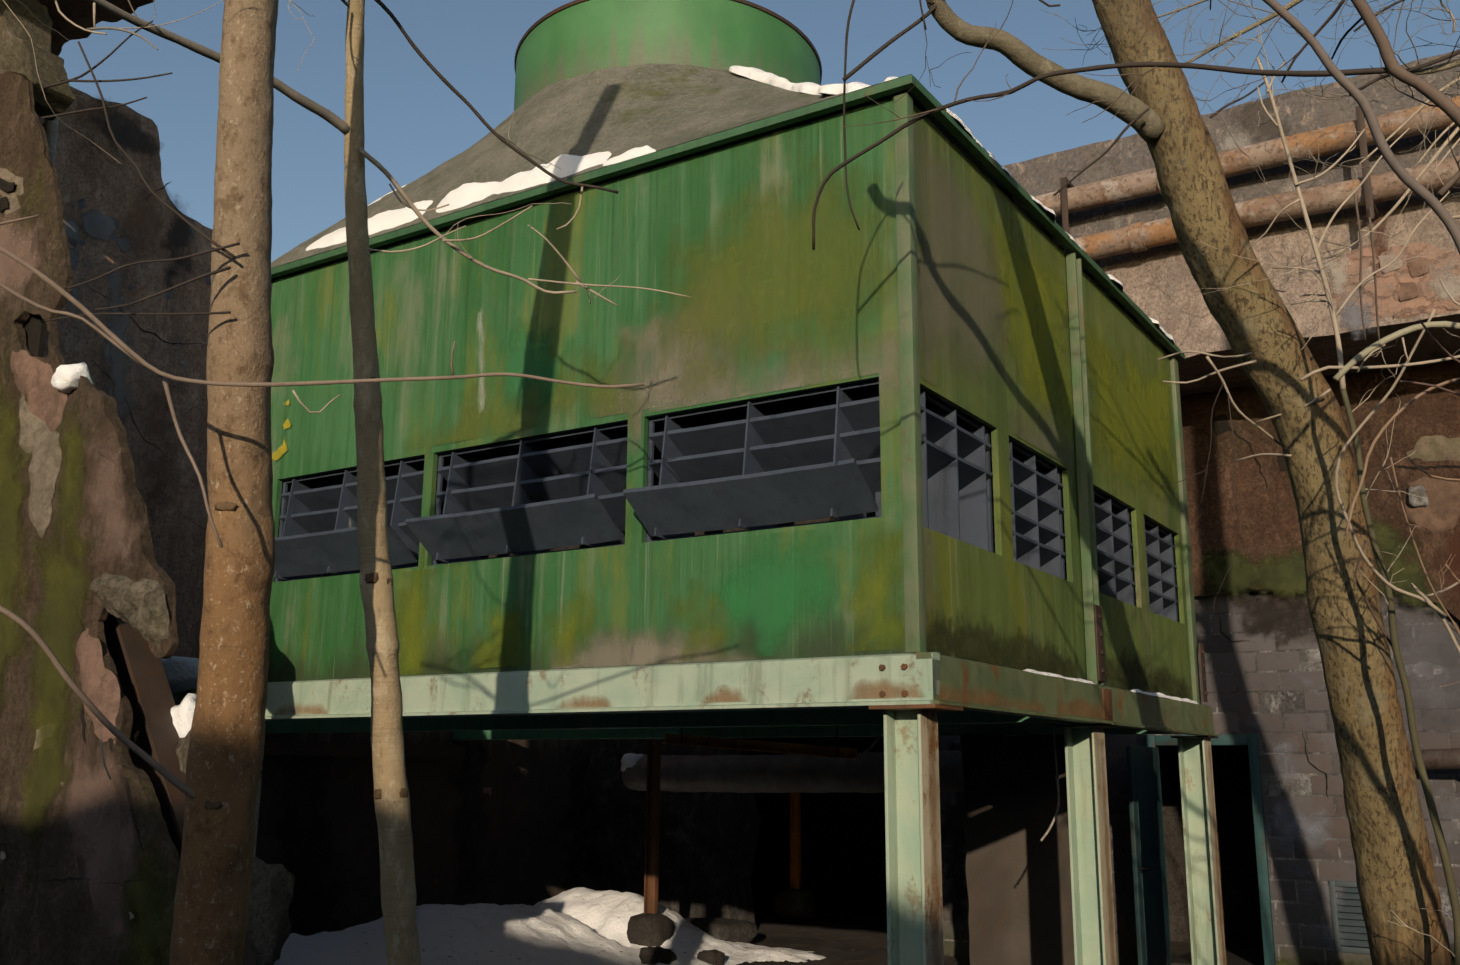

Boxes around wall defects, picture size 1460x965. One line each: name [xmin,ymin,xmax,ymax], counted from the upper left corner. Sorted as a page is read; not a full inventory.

rust [1374,218,1386,266]
spalling [1326,242,1460,328]
peeling [1401,623,1460,709]
rust [711,691,739,702]
rust [856,684,916,699]